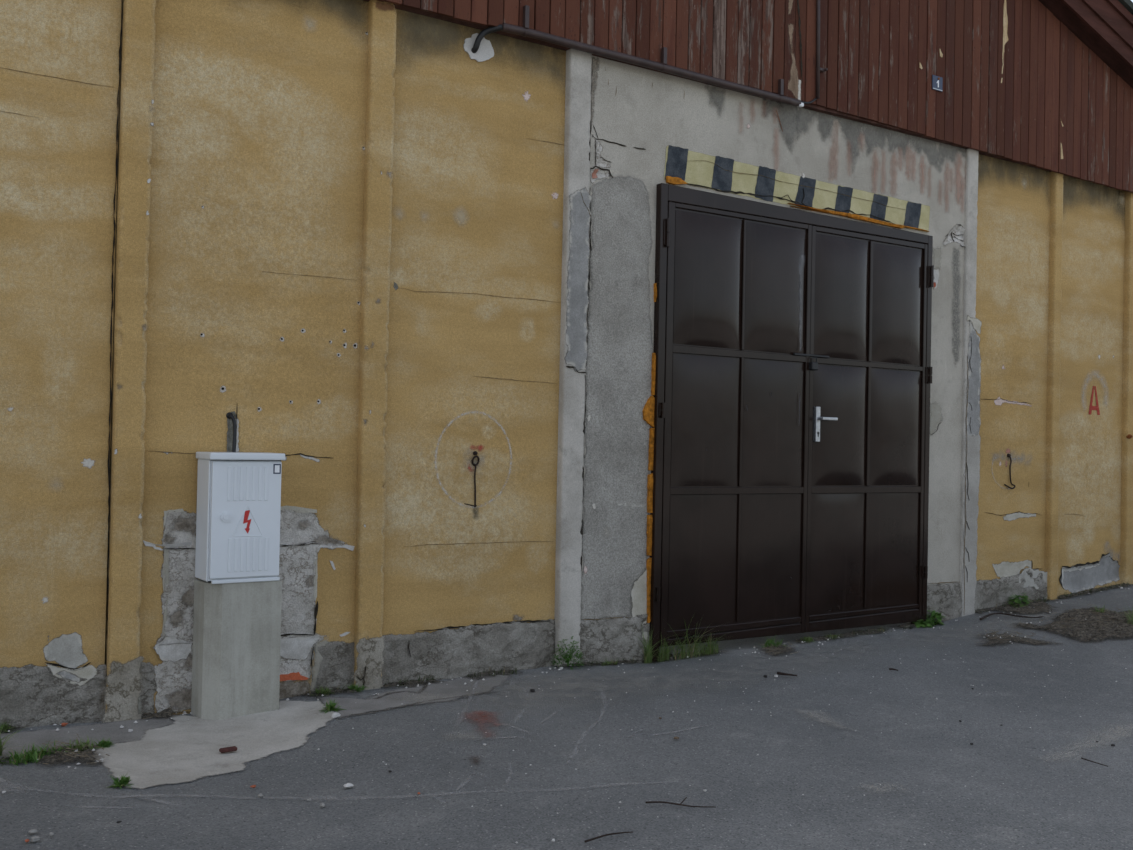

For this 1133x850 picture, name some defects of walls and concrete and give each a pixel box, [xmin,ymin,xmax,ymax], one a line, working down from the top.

damp [764,99,1046,183]
crack [393,282,552,302]
crack [476,124,646,570]
spalling [143,509,197,713]
spalling [279,506,355,699]
crack [406,540,545,548]
spalling [992,553,1120,593]
flaking render [43,632,97,686]